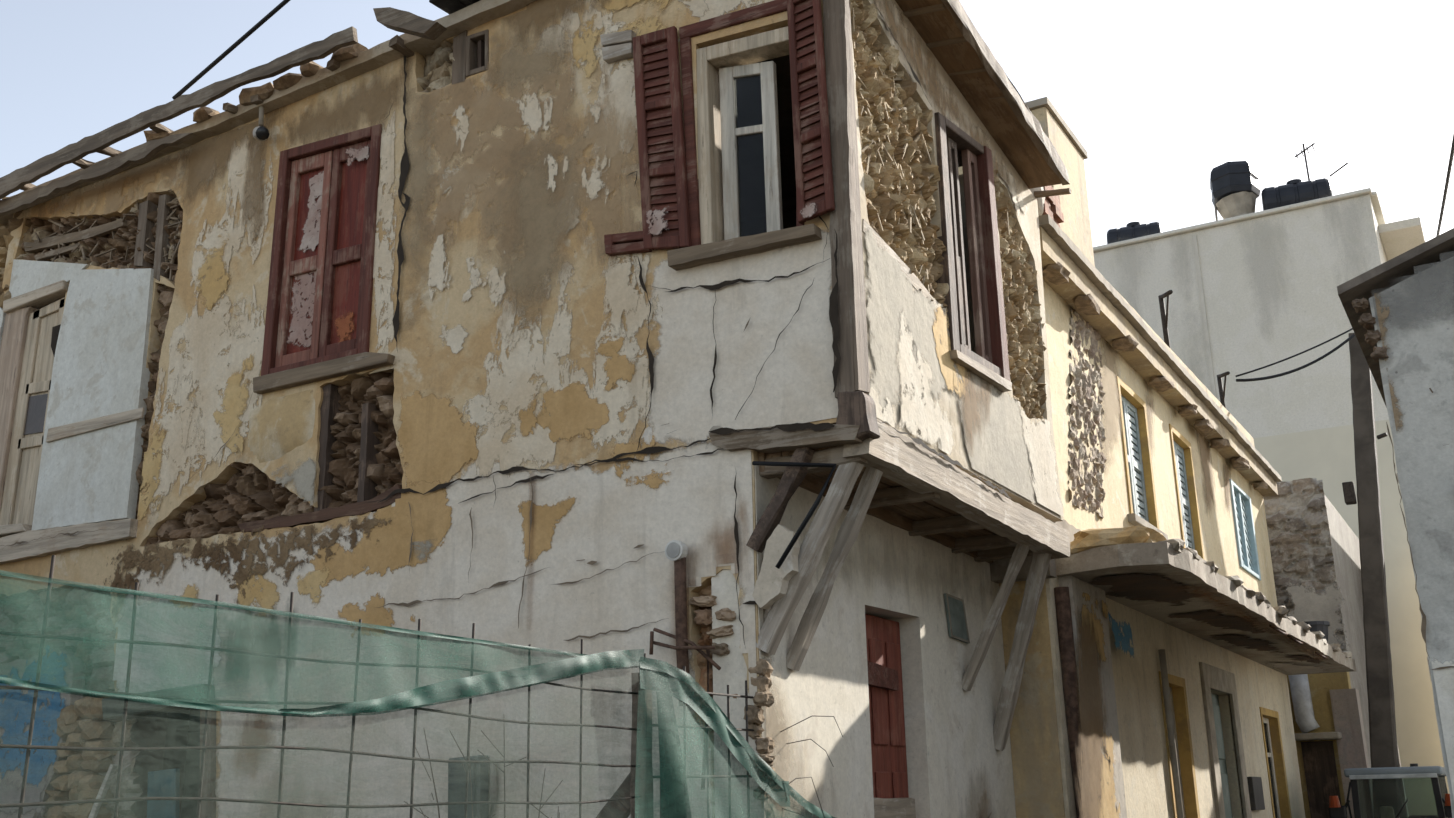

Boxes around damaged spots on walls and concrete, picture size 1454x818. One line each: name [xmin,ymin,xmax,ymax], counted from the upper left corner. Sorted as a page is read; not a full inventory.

crack [385,56,410,352]
spalling [416,39,455,95]
peeling [513,92,553,134]
peeling [527,0,773,234]
spalling [850,0,1139,519]
peeling [16,105,838,818]
crack [378,216,830,648]